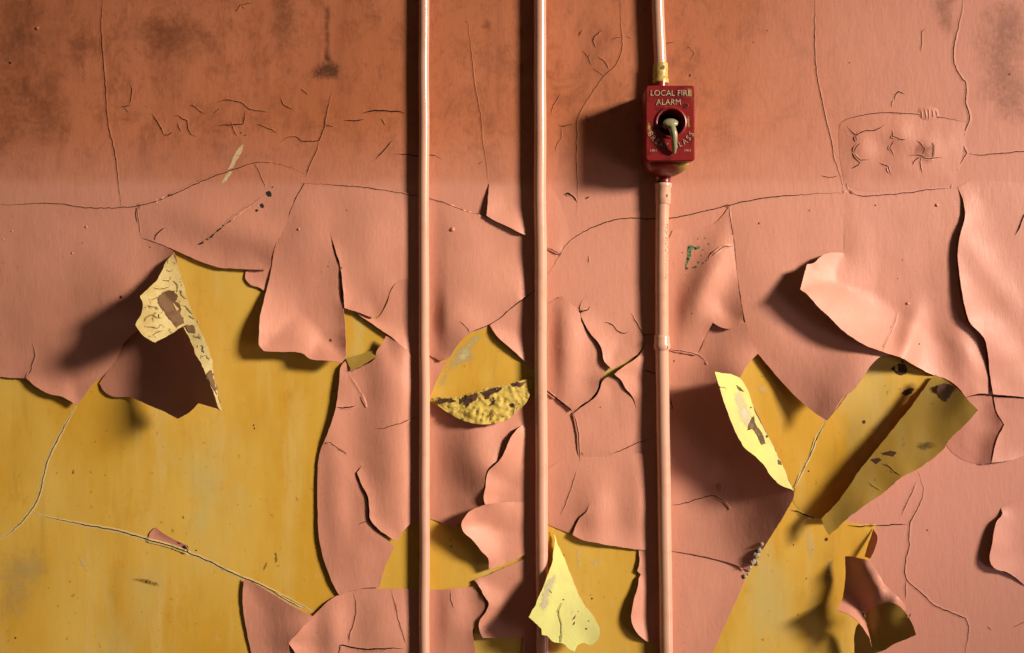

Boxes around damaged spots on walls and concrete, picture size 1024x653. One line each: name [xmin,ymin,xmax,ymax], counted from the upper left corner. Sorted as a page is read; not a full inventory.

crack [0,0,484,245]
crack [459,0,1024,333]
crack [0,405,316,613]
peeling [0,144,660,653]
crack [337,589,406,653]
crack [336,376,419,430]
crack [547,381,602,515]
crack [576,306,708,364]
crack [791,420,827,519]
peeling [668,180,1024,653]
crack [847,471,1024,653]
crack [989,392,1024,400]